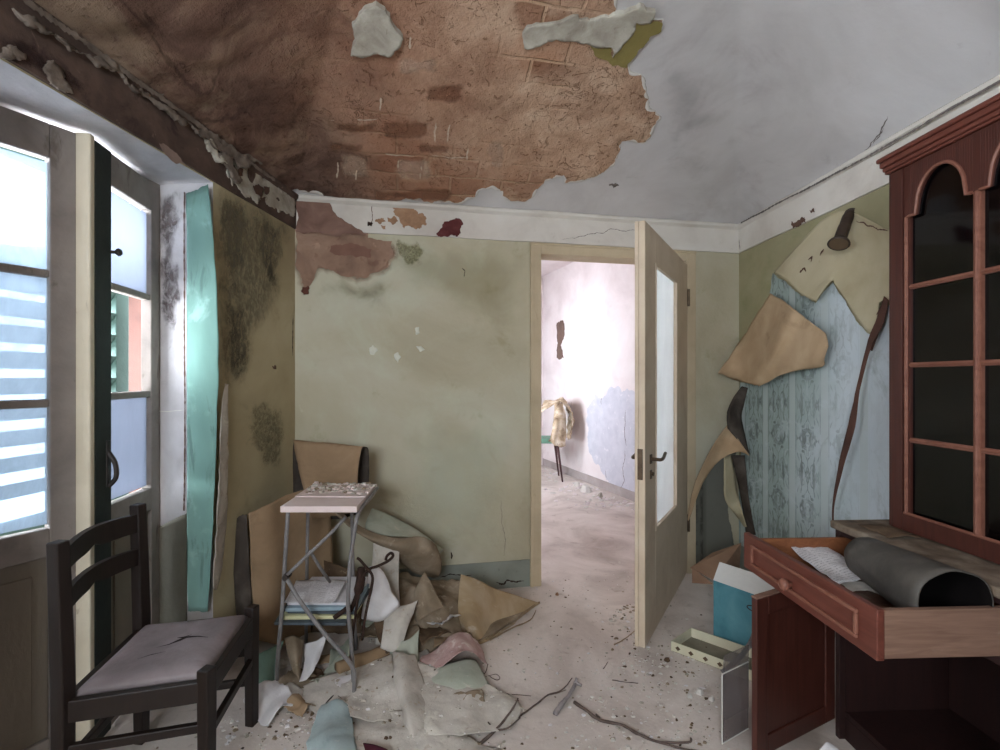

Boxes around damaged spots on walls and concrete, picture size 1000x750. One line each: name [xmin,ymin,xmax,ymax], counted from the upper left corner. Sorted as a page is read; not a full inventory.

flaking render [11,0,664,295]
crack [739,80,1000,247]
mould [160,197,180,324]
mould [219,201,280,374]
peeling [556,320,565,360]
peeling [586,386,635,492]